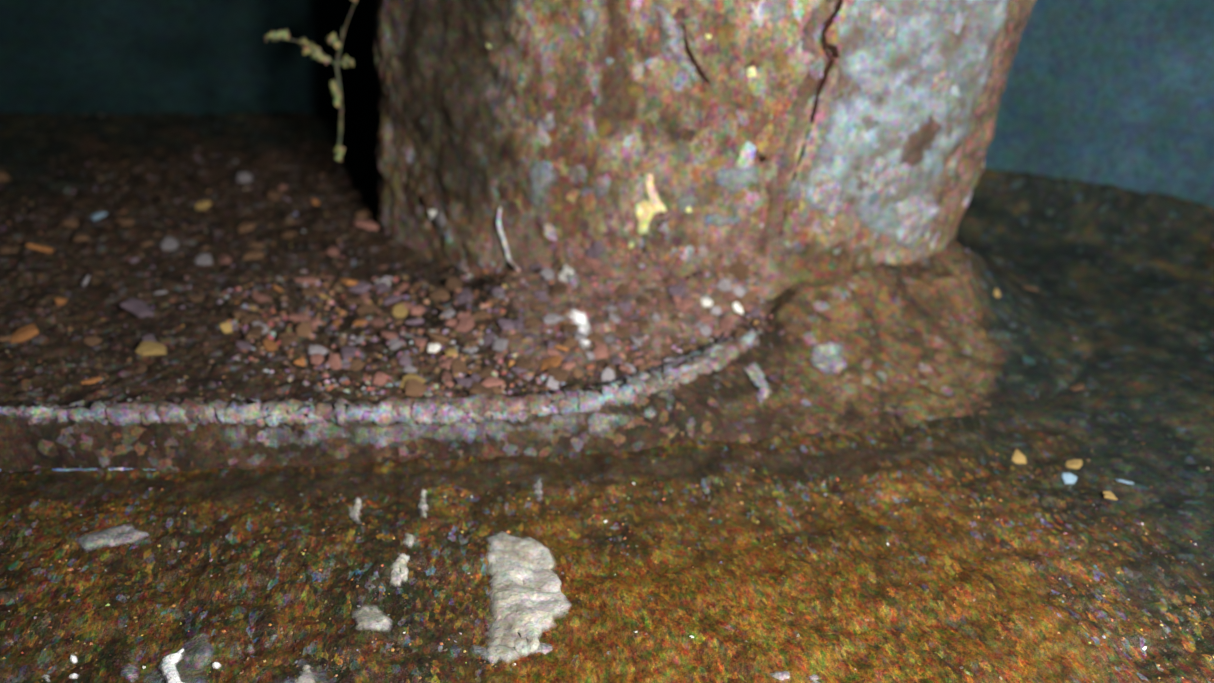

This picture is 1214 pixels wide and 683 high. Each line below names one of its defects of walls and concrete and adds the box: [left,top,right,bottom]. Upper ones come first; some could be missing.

crack [780,0,843,236]